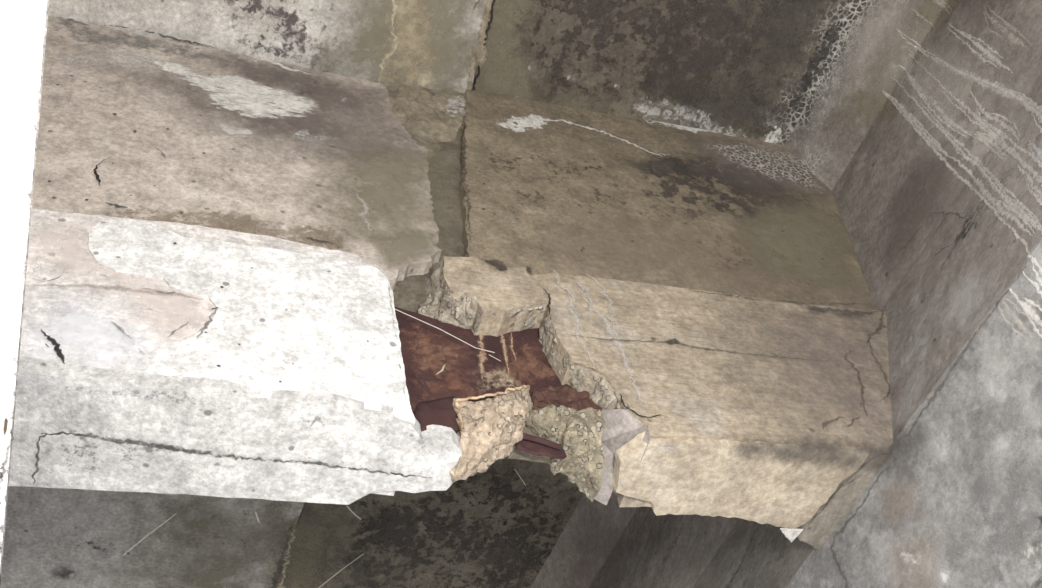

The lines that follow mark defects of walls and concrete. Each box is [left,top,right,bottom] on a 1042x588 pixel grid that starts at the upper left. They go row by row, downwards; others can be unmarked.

water stain [55,0,434,155]
water stain [489,0,1042,341]
peeling [105,195,343,249]
crack [41,329,65,364]
crack [168,307,218,337]
spalling [418,256,496,333]
rust [419,331,554,430]
spalling [485,259,508,271]
spalling [449,305,673,505]
crack [620,394,664,418]
crack [0,413,432,490]
water stain [262,468,574,588]